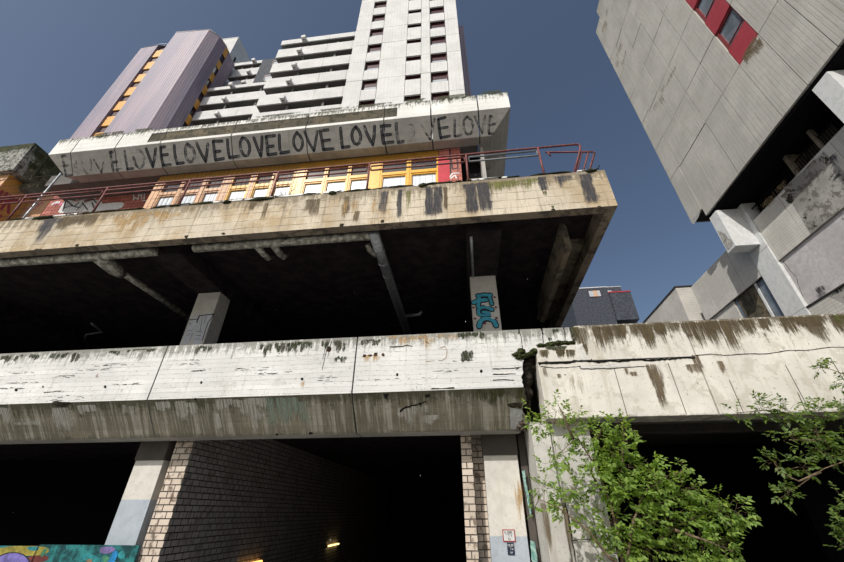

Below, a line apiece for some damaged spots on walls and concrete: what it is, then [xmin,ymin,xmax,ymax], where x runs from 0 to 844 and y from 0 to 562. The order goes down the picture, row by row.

damp [342,196,360,221]
damp [379,189,411,216]
damp [425,186,447,215]
damp [463,173,598,213]
peeling [784,151,844,233]
damp [260,340,347,363]
crack [493,329,523,381]
crack [539,328,830,370]
damp [539,314,844,358]
damp [686,355,703,373]
damp [478,389,505,404]
damp [646,364,665,405]